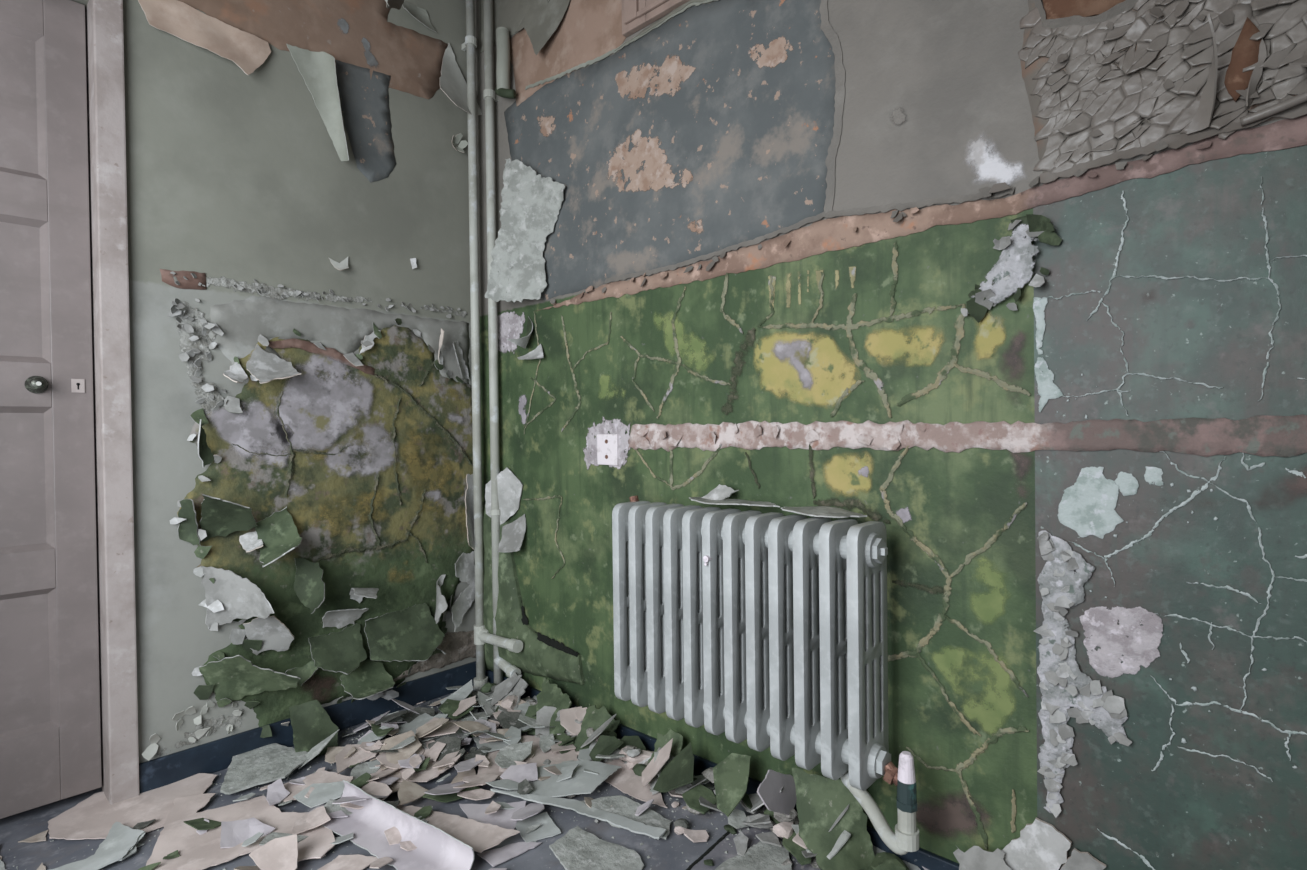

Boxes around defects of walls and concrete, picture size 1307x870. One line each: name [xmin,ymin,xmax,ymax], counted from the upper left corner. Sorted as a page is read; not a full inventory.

flaking render [138,0,482,183]
water stain [210,355,451,513]
spalling [142,269,526,802]
peeling [329,257,349,270]
water stain [754,333,856,406]
water stain [824,454,872,495]
flaking render [485,0,1307,870]
water stain [865,328,943,366]
crack [524,177,1307,490]
crack [809,444,1029,850]
crack [1068,451,1307,782]
crack [1097,828,1154,870]